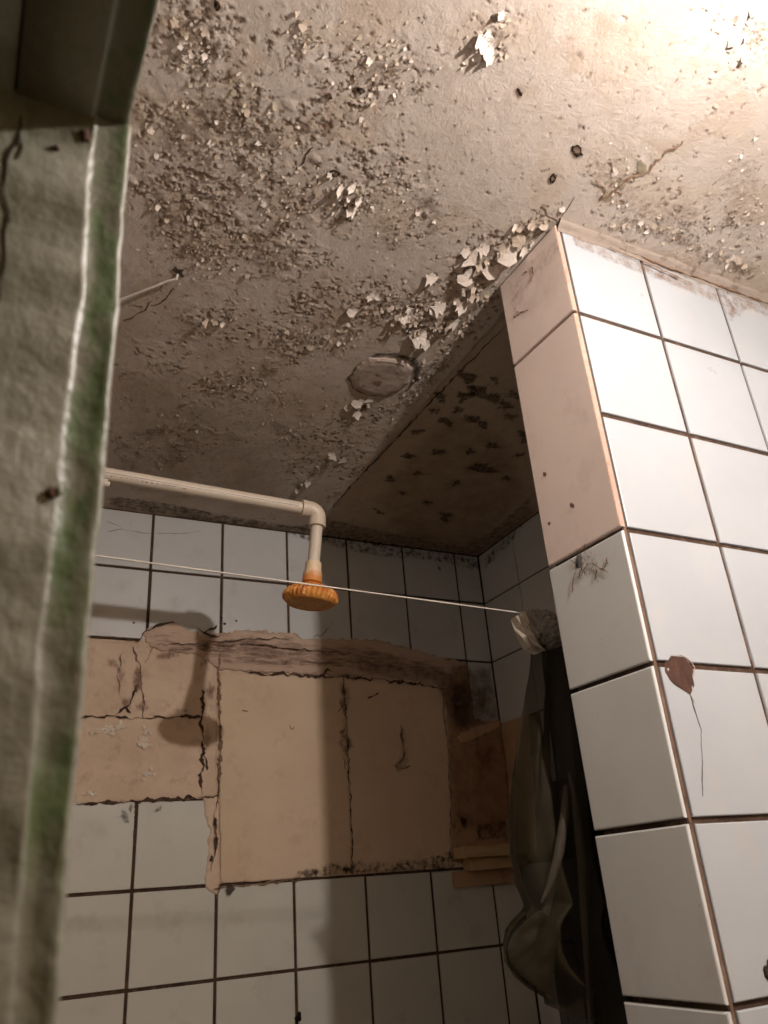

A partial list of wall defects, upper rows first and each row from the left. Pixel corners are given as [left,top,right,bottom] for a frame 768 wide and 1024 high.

peeling [123,0,565,423]
crack [596,181,622,201]
peeling [571,142,768,278]
water stain [429,370,520,429]
crack [77,621,454,898]
flaking render [74,621,465,895]
water stain [298,852,454,876]